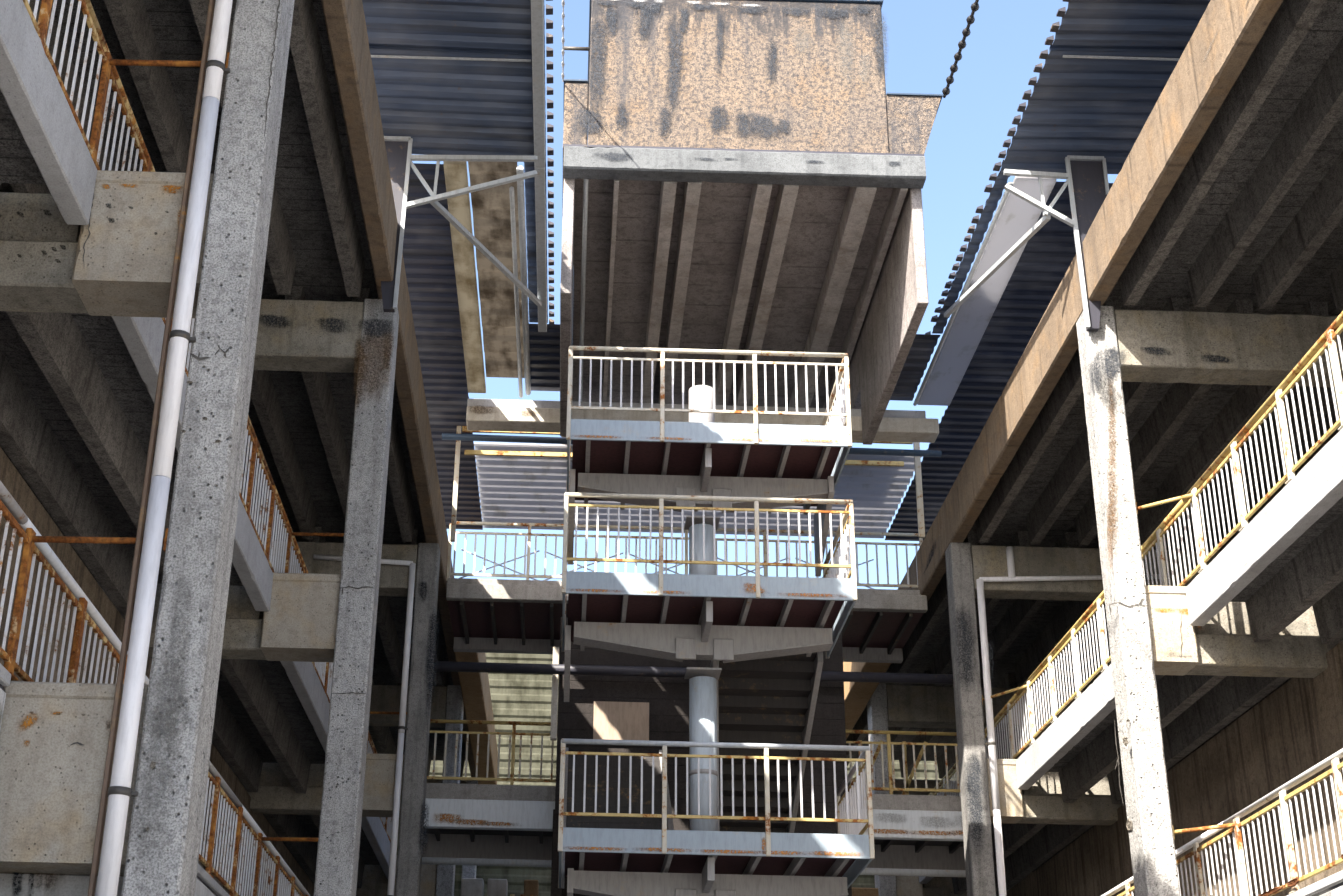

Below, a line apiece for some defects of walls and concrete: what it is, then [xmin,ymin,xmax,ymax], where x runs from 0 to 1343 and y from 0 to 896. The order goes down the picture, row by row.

damp [784,6,887,75]
damp [578,1,724,136]
damp [767,41,777,79]
damp [710,106,789,138]
damp [261,315,290,327]
damp [320,319,346,333]
rust [20,712,37,746]